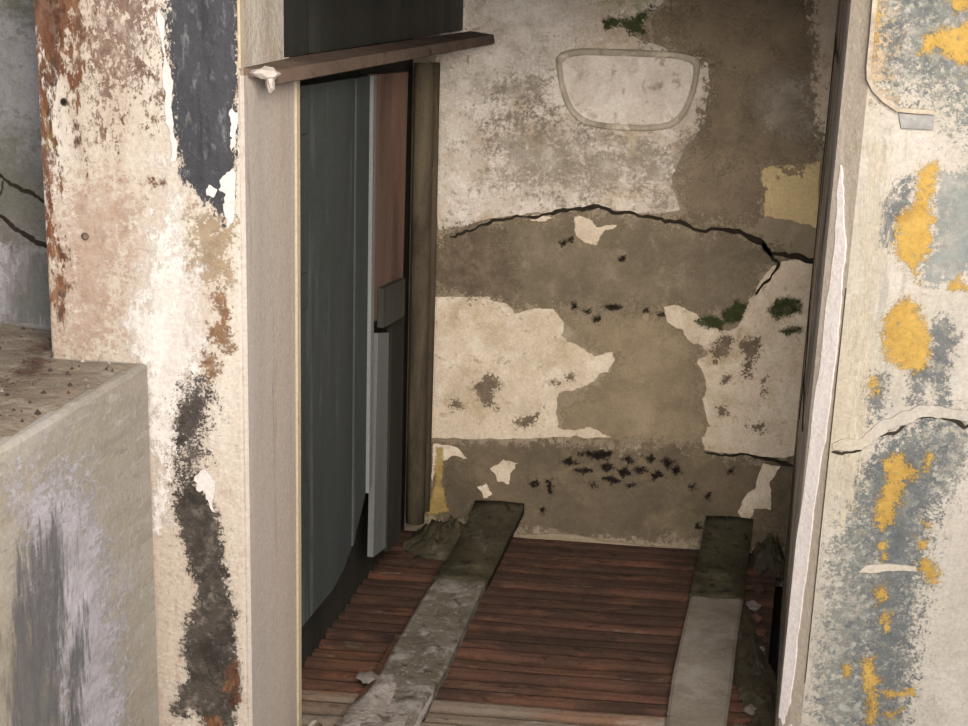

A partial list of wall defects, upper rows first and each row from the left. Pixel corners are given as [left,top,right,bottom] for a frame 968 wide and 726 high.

crack [0,174,47,249]
damp [3,451,133,726]
corrosion [34,0,173,331]
peeling [156,0,241,300]
corrosion [223,658,243,709]
peeling [431,0,710,481]
damp [425,0,831,716]
crack [449,53,834,432]
peeling [664,259,813,518]
peeling [760,0,838,228]
peeling [768,165,968,726]
crack [804,288,968,683]